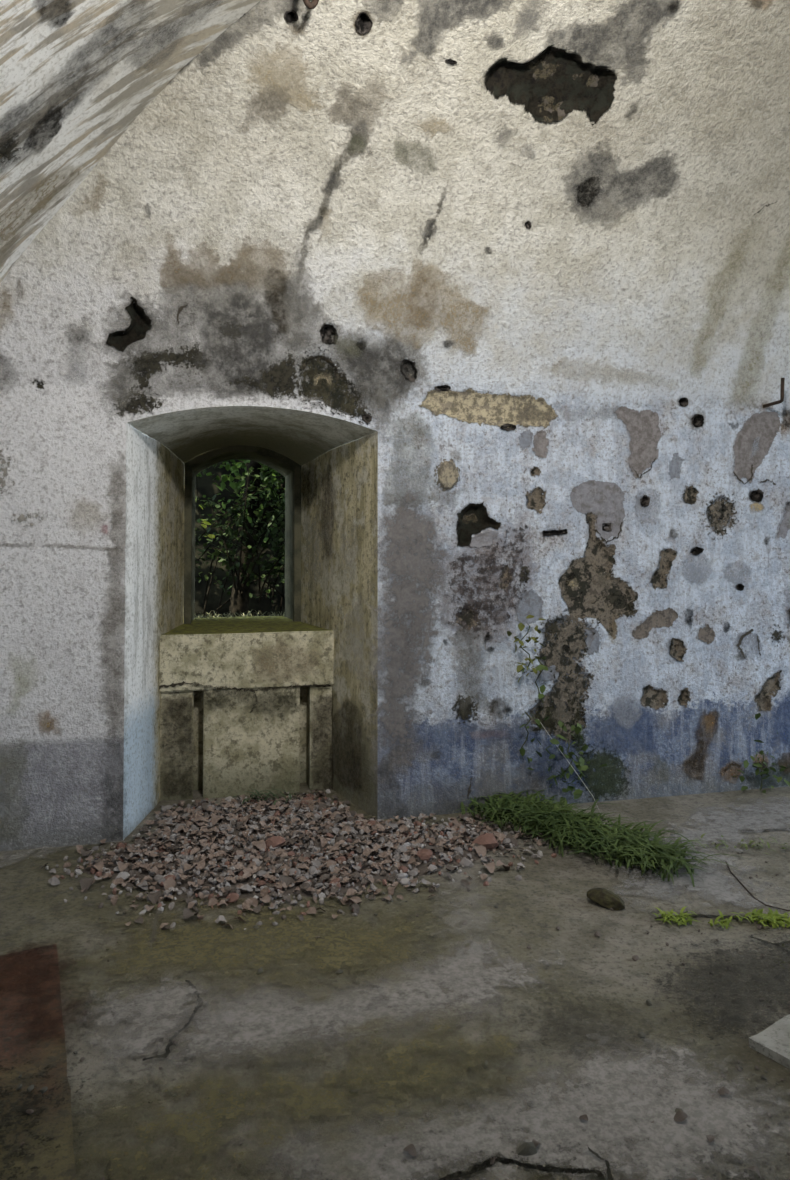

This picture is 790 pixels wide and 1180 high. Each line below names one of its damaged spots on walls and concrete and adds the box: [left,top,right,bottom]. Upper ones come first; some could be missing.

damp [406,0,504,60]
damp [0,0,222,171]
spalling [484,46,617,125]
damp [568,147,677,219]
spalling [106,297,155,354]
damp [110,266,488,424]
spalling [419,385,558,514]
peeling [615,406,781,540]
spalling [443,480,785,743]
damp [452,692,512,724]
crack [142,980,204,1061]
crack [439,1147,613,1180]